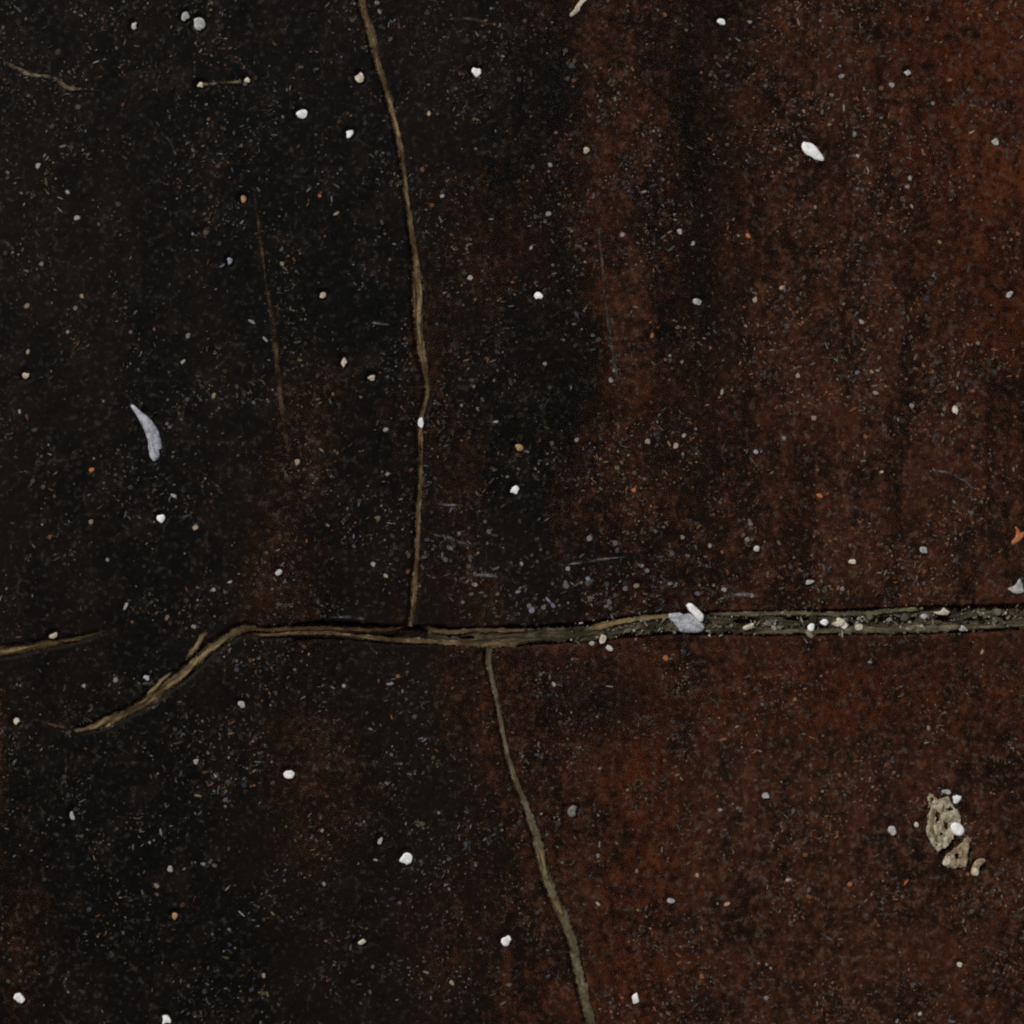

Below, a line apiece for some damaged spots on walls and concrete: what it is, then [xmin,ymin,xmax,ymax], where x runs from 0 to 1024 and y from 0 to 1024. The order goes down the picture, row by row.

crack [13,65,81,91]
crack [47,0,683,1024]
crack [699,607,1024,635]
crack [0,630,106,657]